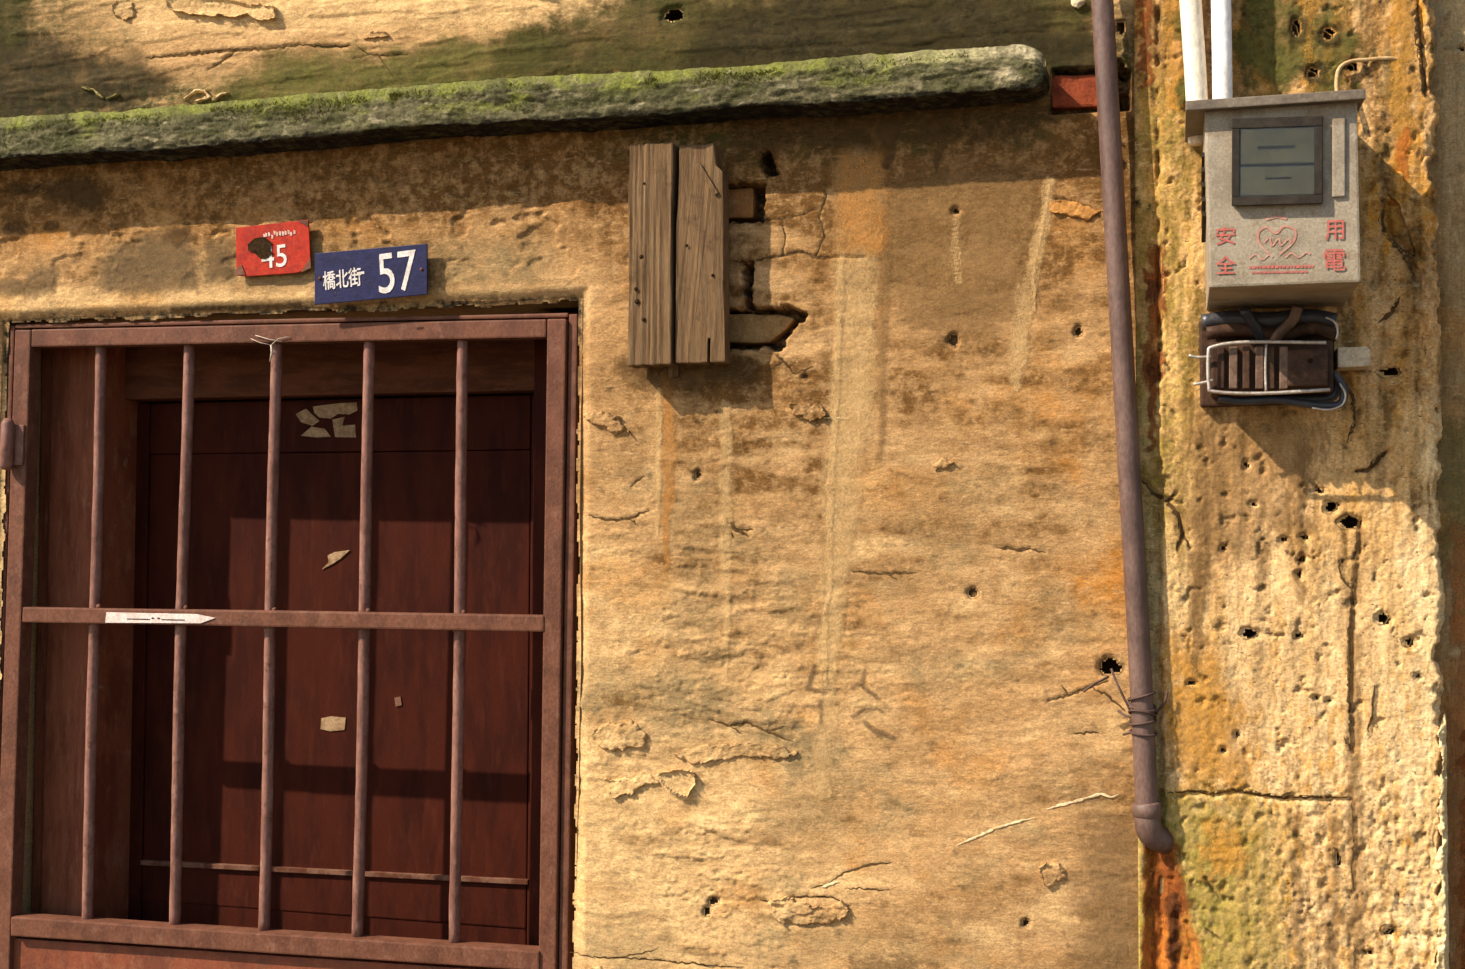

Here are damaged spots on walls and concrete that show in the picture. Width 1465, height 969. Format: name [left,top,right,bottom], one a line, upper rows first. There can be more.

damp [0,0,170,118]
flaking render [164,0,277,22]
damp [684,0,1095,75]
flaking render [728,188,758,222]
flaking render [729,314,798,346]
rust [1140,245,1166,452]
damp [1351,529,1362,582]
crack [1338,523,1375,751]
peeling [657,769,697,798]
crack [1167,784,1356,900]
rust [1141,827,1203,969]
damp [1324,898,1365,969]